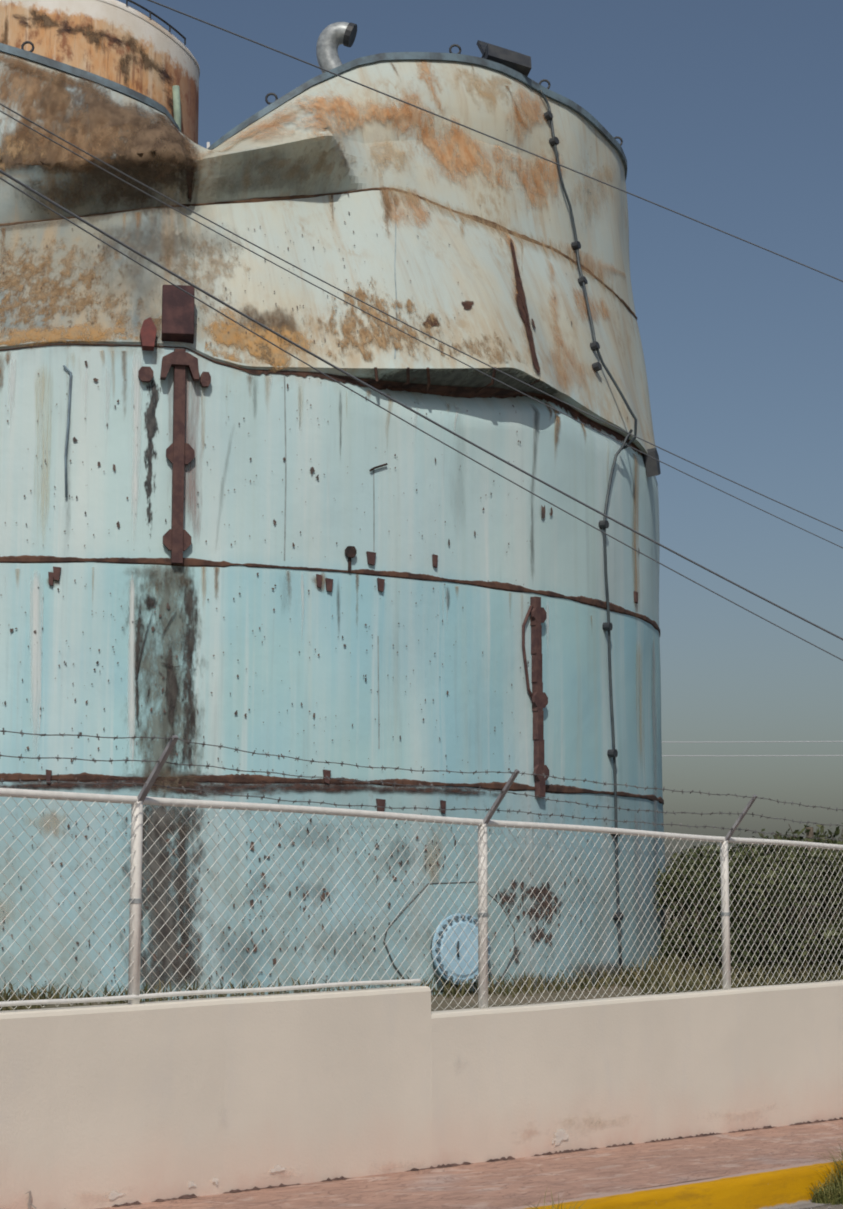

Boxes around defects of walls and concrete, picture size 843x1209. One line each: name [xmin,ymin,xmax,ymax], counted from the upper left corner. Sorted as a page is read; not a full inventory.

rust [299,60,562,205]
rust [0,228,138,384]
rust [381,186,613,317]
rust [205,282,644,591]
damp [125,568,203,991]
rust [495,872,570,963]